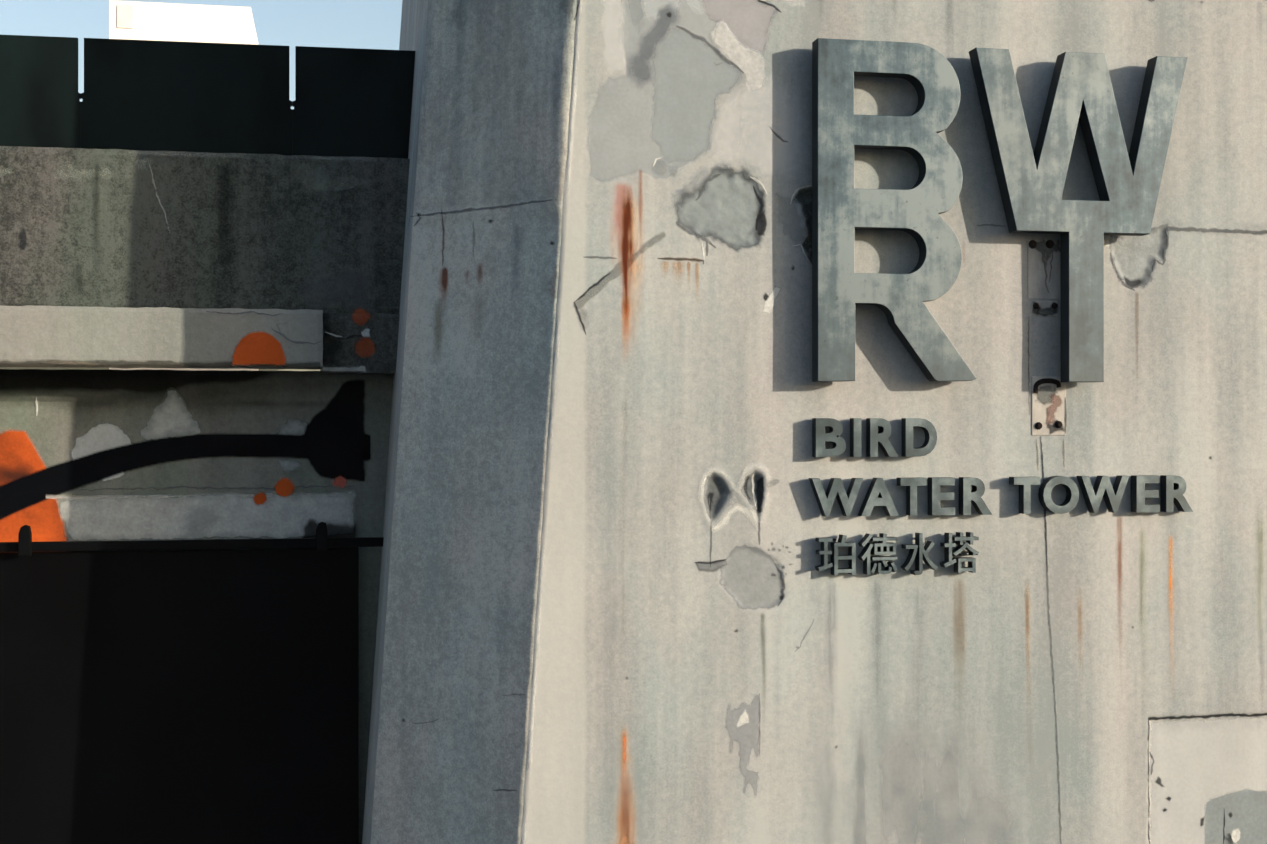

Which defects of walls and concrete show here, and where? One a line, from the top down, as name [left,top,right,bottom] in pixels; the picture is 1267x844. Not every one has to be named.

peeling [588,0,782,181]
crack [410,199,556,226]
spalling [574,233,665,334]
rust [621,175,642,318]
spalling [676,167,767,260]
peeling [763,288,780,313]
spalling [1110,225,1168,291]
spalling [695,471,791,609]
peeling [726,693,760,796]